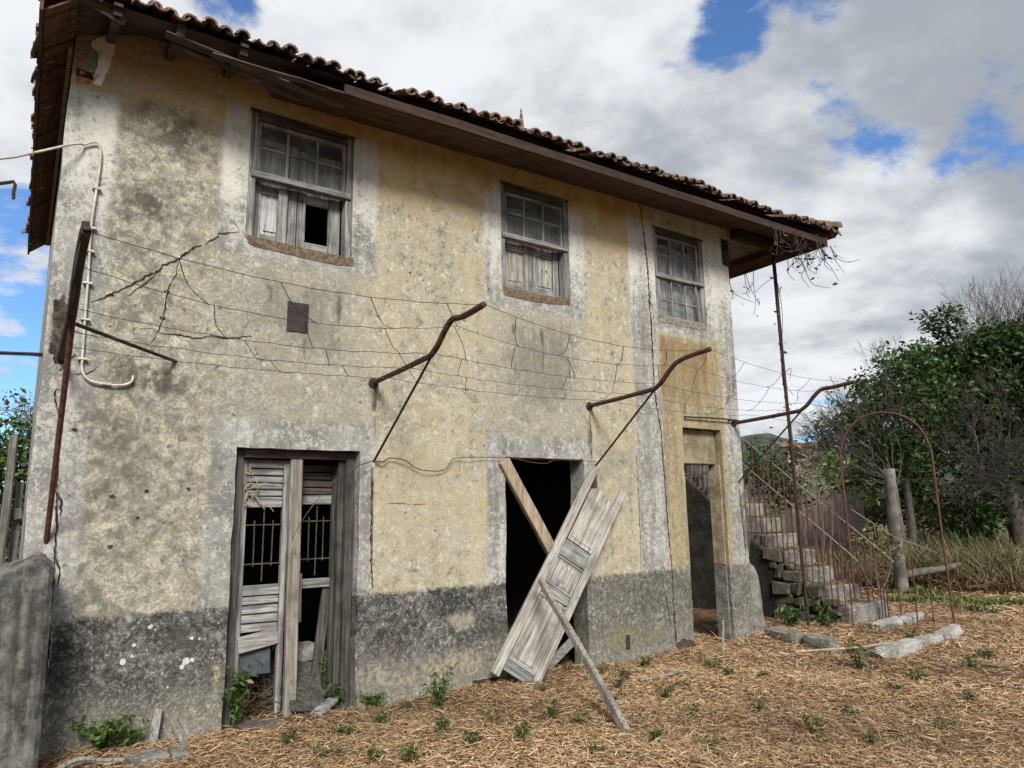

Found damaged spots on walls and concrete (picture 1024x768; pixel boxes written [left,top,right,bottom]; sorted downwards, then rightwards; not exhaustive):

spalling [72,35,116,86]
crack [92,222,248,344]
crack [636,204,677,648]